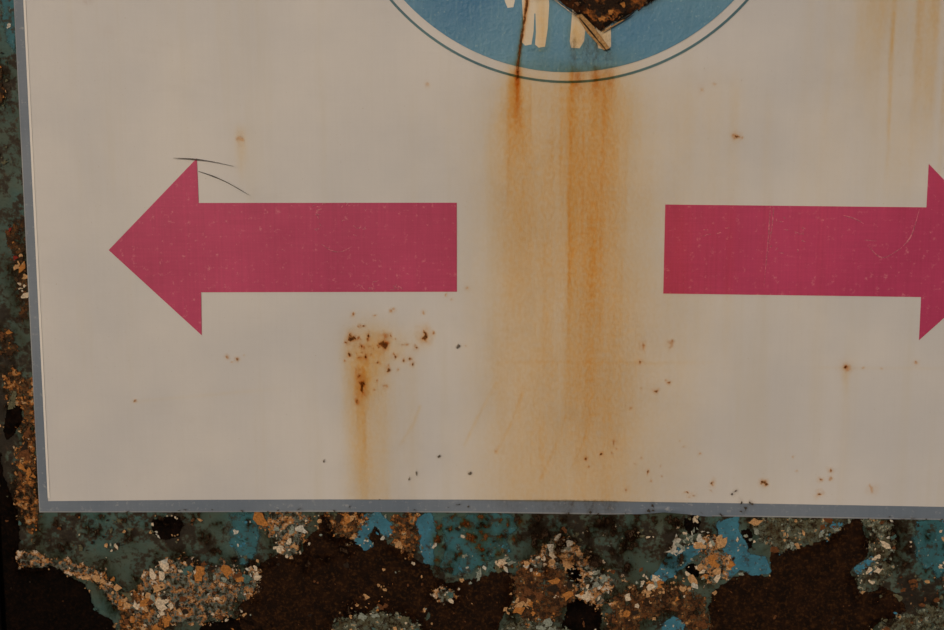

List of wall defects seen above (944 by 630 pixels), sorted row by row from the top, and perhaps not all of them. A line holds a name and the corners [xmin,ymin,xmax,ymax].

peeling [5,219,29,322]
peeling [0,329,845,630]
peeling [854,519,944,630]